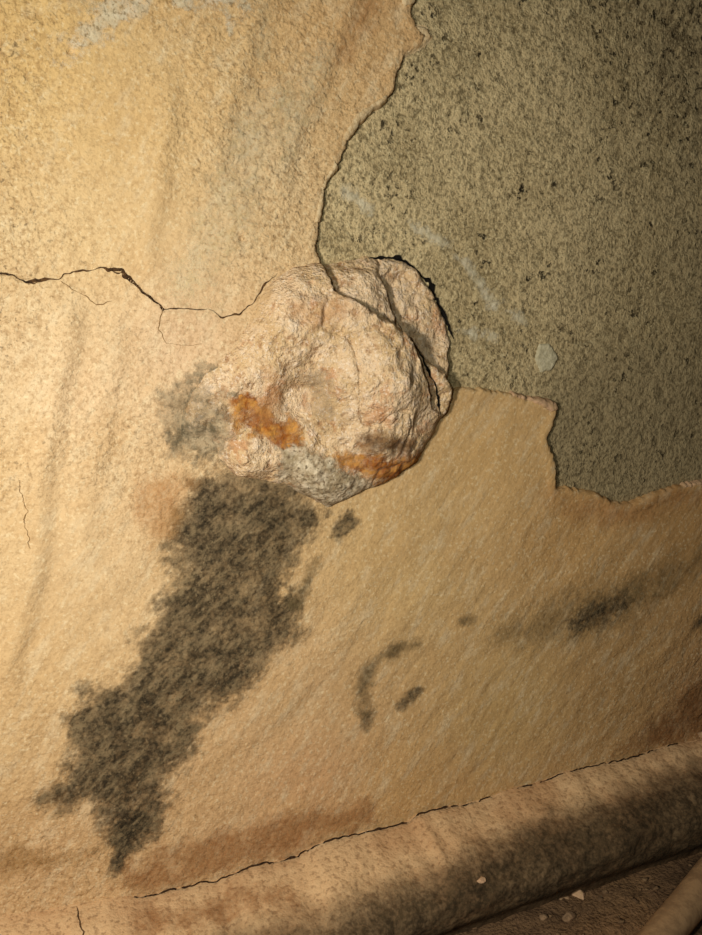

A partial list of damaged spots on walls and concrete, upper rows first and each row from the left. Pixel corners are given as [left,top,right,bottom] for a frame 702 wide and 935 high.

spalling [314,0,702,502]
crack [0,267,274,346]
water stain [158,363,233,464]
rust [231,392,304,449]
spalling [274,443,383,507]
rust [336,434,421,485]
water stain [333,510,358,537]
water stain [37,472,329,877]
water stain [398,688,421,708]
crack [517,743,678,789]
water stain [134,803,370,885]
crack [134,796,492,898]